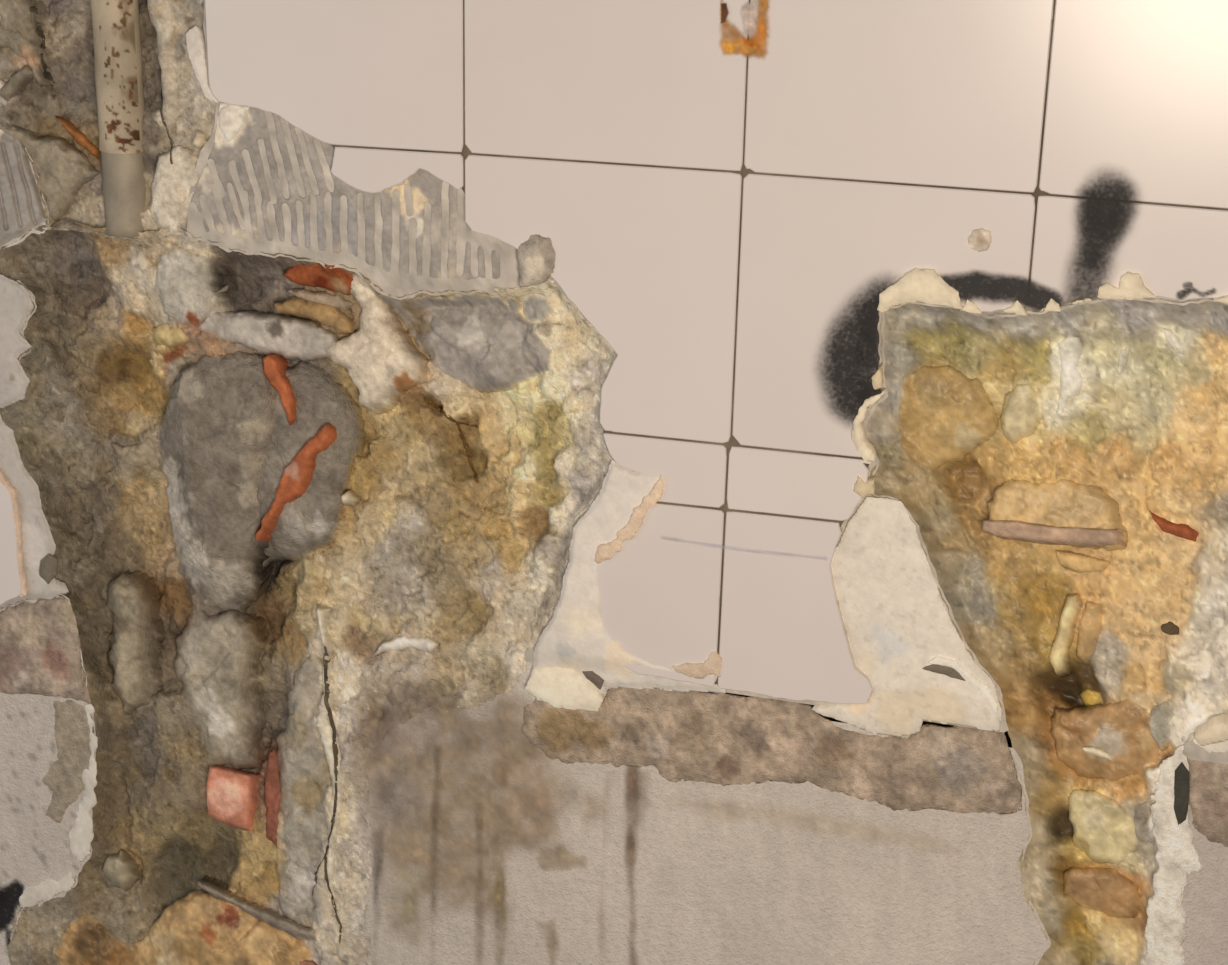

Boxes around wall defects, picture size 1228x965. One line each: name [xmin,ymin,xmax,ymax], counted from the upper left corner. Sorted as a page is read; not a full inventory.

rust [720,0,768,57]
spalling [0,0,617,965]
spalling [521,268,1228,965]
crack [312,646,342,943]
damp [367,701,551,922]
damp [626,828,635,866]
damp [627,765,638,802]